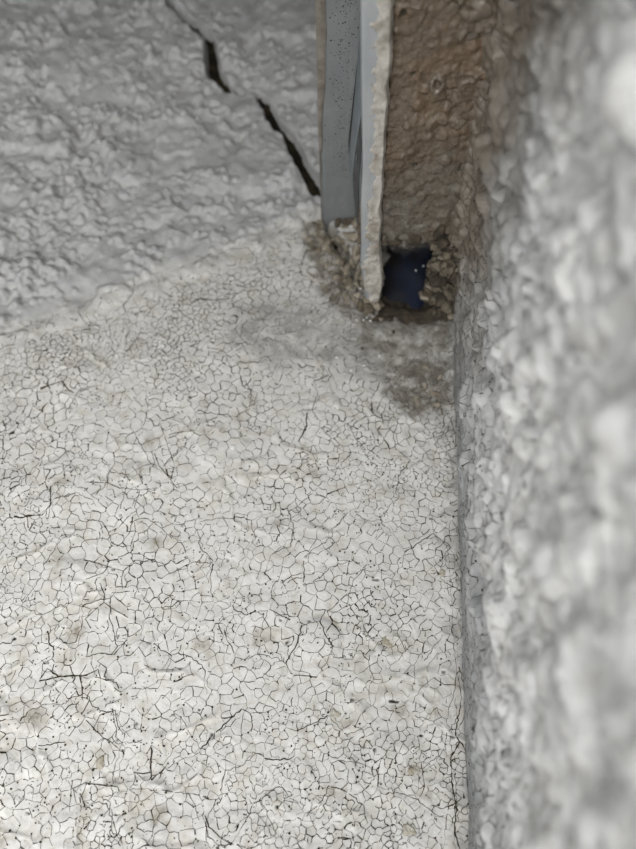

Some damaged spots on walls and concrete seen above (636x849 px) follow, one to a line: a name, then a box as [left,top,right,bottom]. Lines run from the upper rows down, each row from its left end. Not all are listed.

crack [171,7,320,197]
spalling [306,217,385,315]
leakage [383,361,450,414]
crack [0,168,573,849]